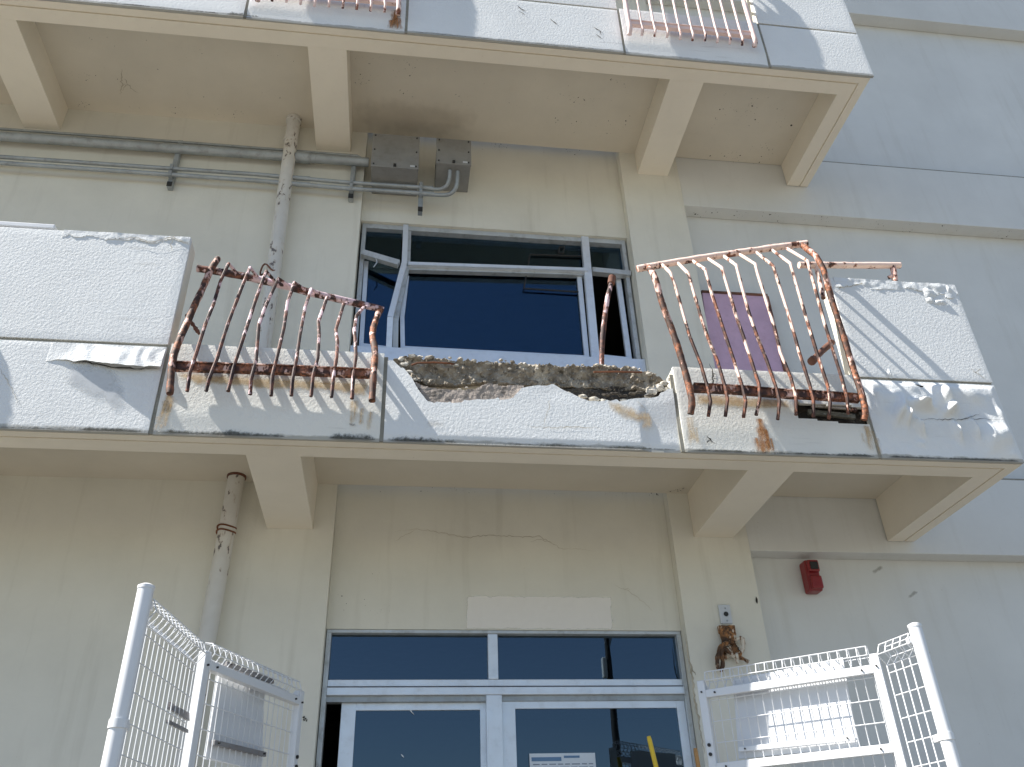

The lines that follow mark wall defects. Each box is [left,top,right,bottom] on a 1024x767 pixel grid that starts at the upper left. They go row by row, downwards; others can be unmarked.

flaking render [62,230,191,244]
flaking render [46,342,166,406]
corrosion [184,375,371,422]
spalling [393,354,670,403]
corrosion [699,396,786,452]